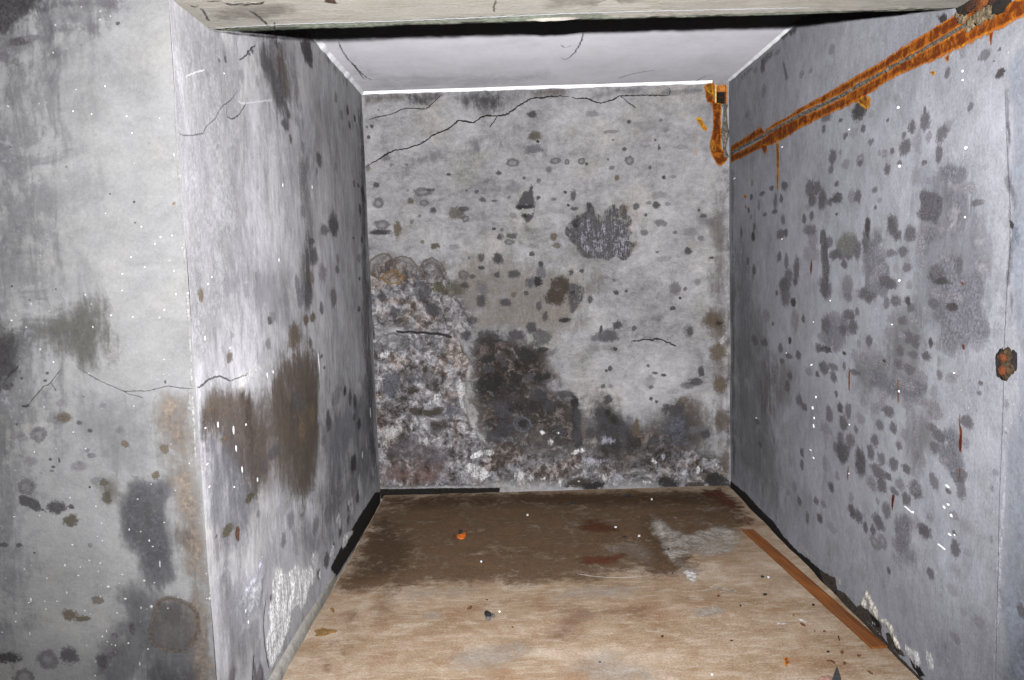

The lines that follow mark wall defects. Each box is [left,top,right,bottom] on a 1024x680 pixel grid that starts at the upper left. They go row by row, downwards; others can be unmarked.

crack [365,88,670,168]
rust [696,0,1024,190]
damp [981,47,1005,78]
crack [197,375,231,388]
damp [204,210,339,545]
flaking render [372,321,493,488]
damp [263,92,923,680]
damp [740,102,990,557]
damp [0,646,79,680]
damp [63,610,91,621]
damp [89,396,215,680]